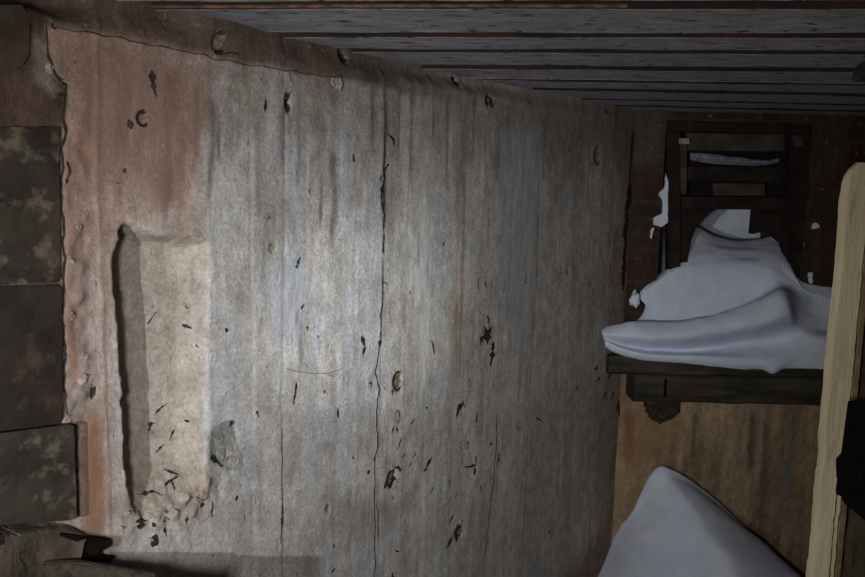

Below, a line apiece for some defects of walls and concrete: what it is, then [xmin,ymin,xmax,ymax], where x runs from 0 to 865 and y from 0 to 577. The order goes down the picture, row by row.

spalling [126,109,151,129]
crack [621,133,633,291]
crack [372,135,395,574]
spalling [480,316,495,366]
spalling [391,370,404,395]
spalling [209,420,242,471]
spalling [384,410,416,500]
spalling [137,469,179,496]
spalling [120,507,189,547]